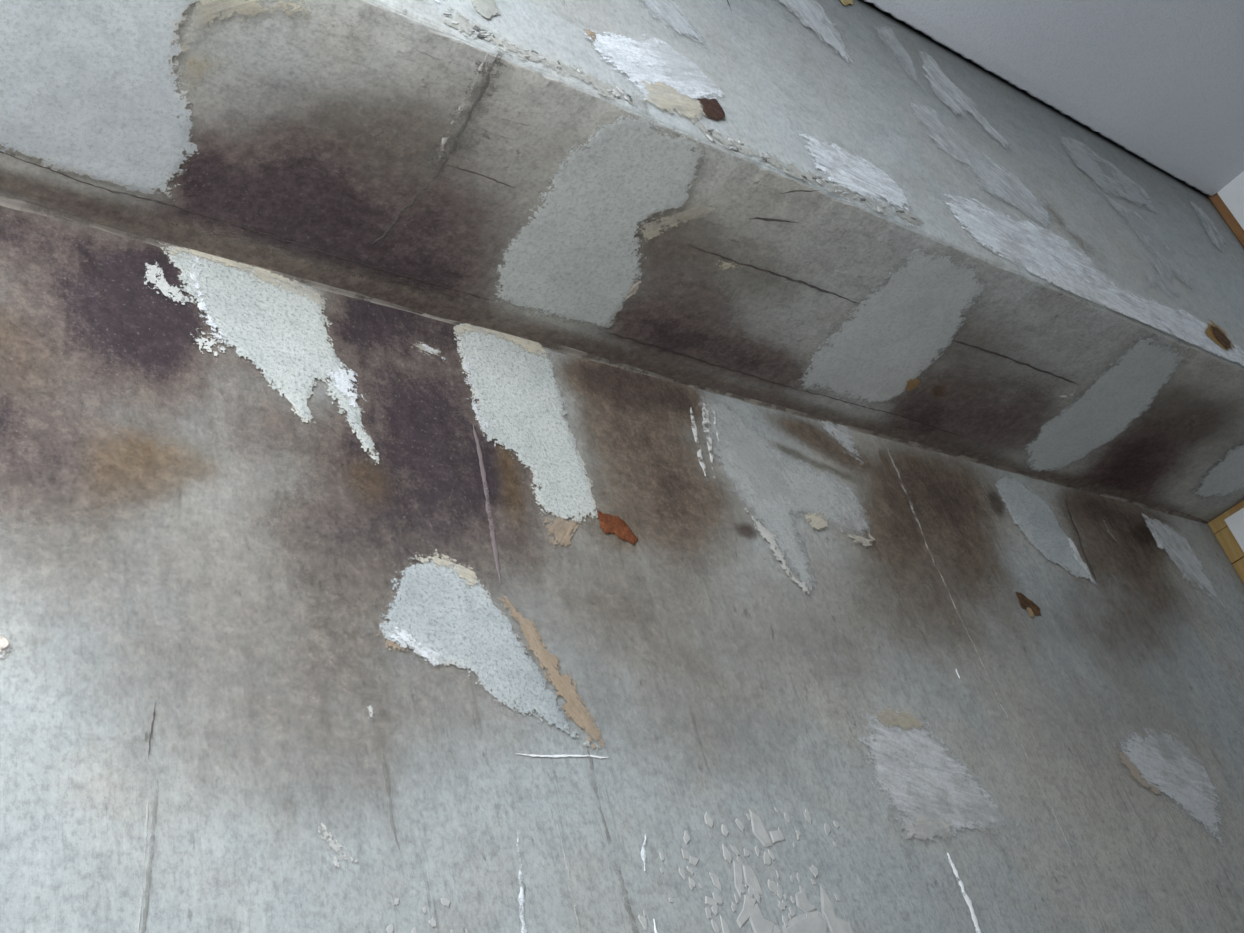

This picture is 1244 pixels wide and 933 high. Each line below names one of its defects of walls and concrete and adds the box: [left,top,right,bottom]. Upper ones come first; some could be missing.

crack [0,54,534,301]
corrosion [697,98,725,120]
water stain [0,102,1219,763]
corrosion [597,511,638,545]